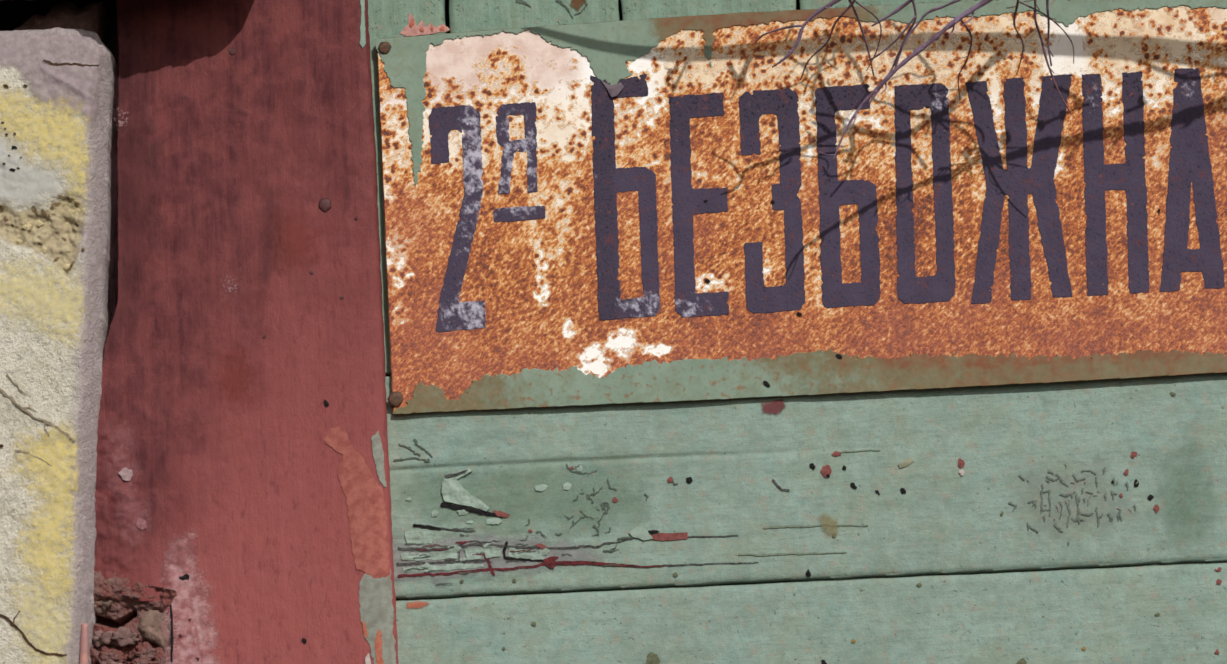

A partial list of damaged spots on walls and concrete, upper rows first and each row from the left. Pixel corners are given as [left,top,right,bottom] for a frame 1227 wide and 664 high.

rust [762,400,785,414]
peeling [324,426,634,664]
crack [0,611,67,657]